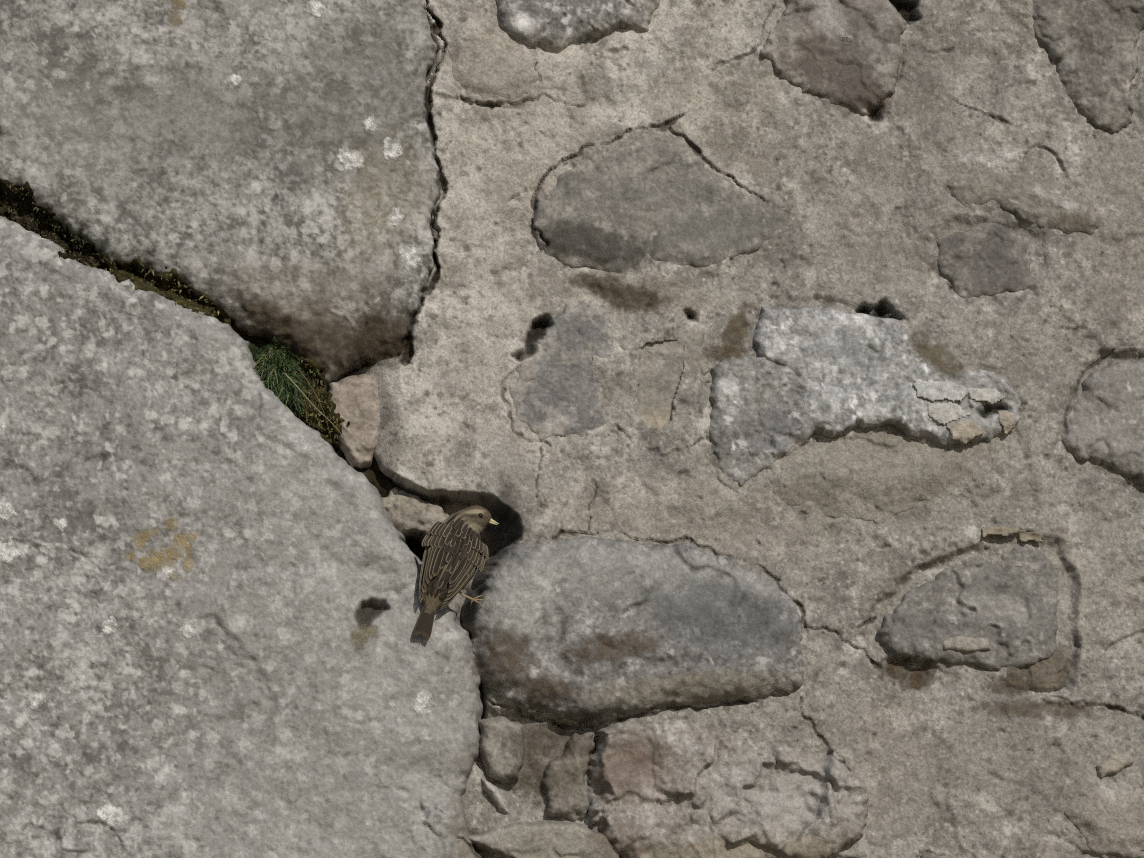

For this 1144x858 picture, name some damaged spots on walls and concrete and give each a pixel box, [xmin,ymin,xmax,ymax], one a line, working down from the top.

crack [429,13,442,37]
crack [424,79,437,142]
crack [661,117,704,160]
crack [0,193,134,273]
crack [400,178,446,364]
crack [217,315,268,349]
crack [296,416,395,498]